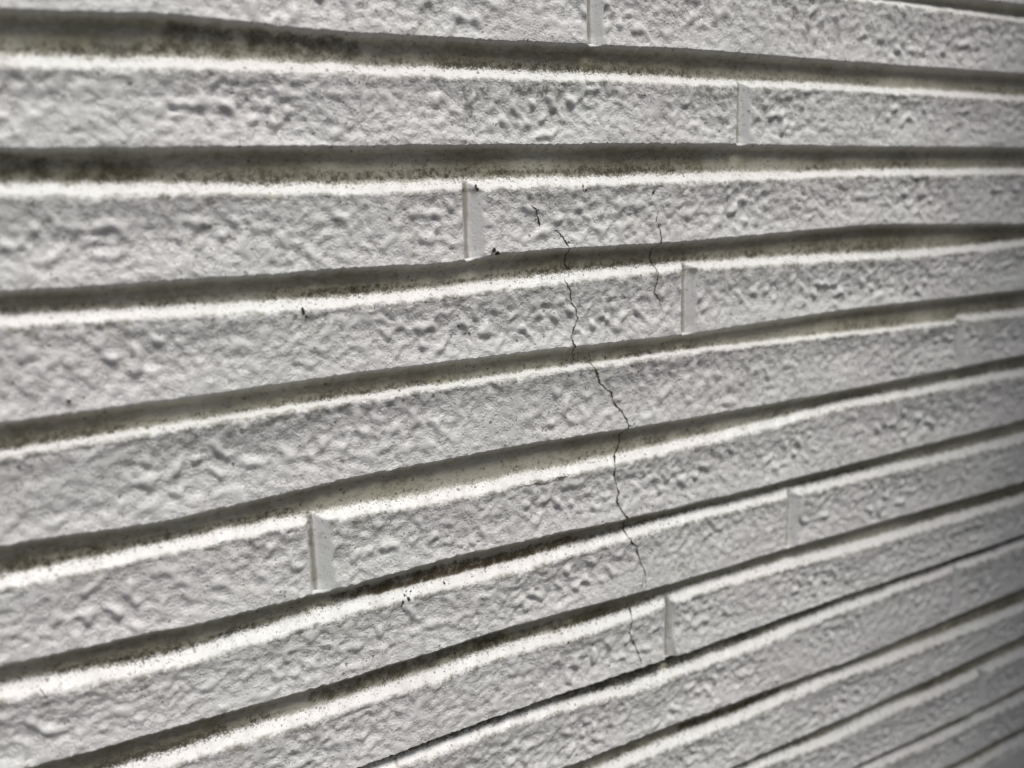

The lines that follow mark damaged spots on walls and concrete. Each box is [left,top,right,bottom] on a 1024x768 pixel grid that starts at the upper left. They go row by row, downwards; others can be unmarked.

crack [532,206,646,660]
crack [649,210,662,308]